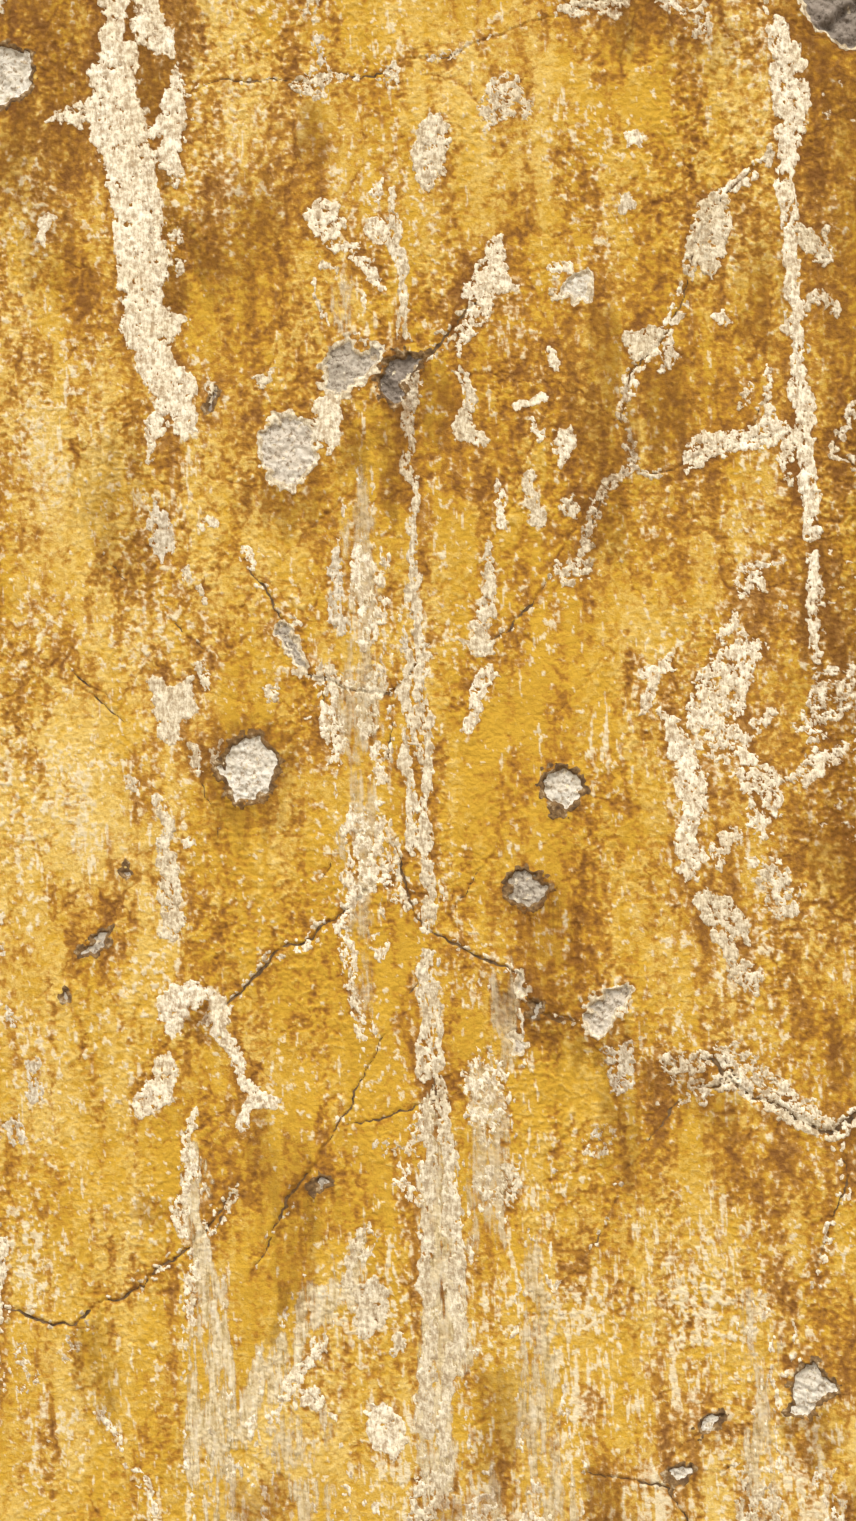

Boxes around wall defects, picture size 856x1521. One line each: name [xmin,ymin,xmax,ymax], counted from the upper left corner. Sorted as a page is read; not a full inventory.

peeling [44,0,222,465]
peeling [410,111,452,193]
crack [407,285,494,411]
crack [483,143,779,651]
peeling [621,324,682,374]
peeling [638,0,856,997]
peeling [124,177,594,1521]
crack [196,837,576,1027]
spalling [579,982,642,1096]
crack [1,1181,239,1329]
crack [613,1049,856,1289]
peeling [93,1408,162,1521]